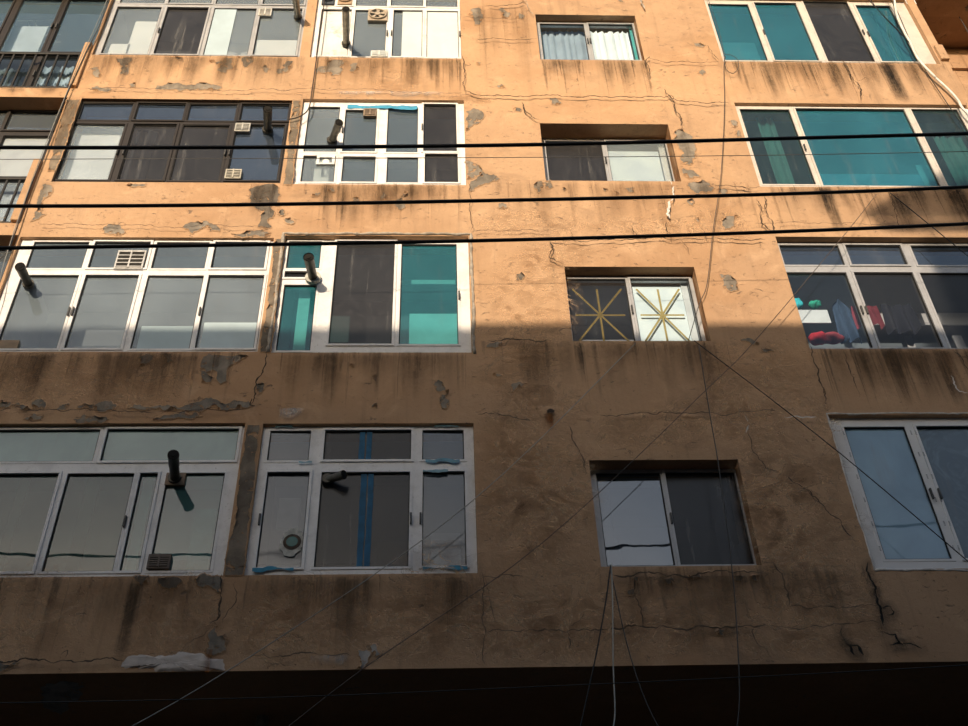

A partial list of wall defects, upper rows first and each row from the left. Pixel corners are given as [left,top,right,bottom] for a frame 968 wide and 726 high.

damp [870,63,902,94]
peeling [47,99,80,171]
peeling [464,108,485,131]
peeling [464,160,500,192]
peeling [673,129,728,206]
peeling [30,184,54,222]
peeling [102,223,125,236]
peeling [182,100,301,353]
peeling [138,353,176,368]
peeling [199,353,248,384]
peeling [0,382,265,424]
crack [481,562,922,664]